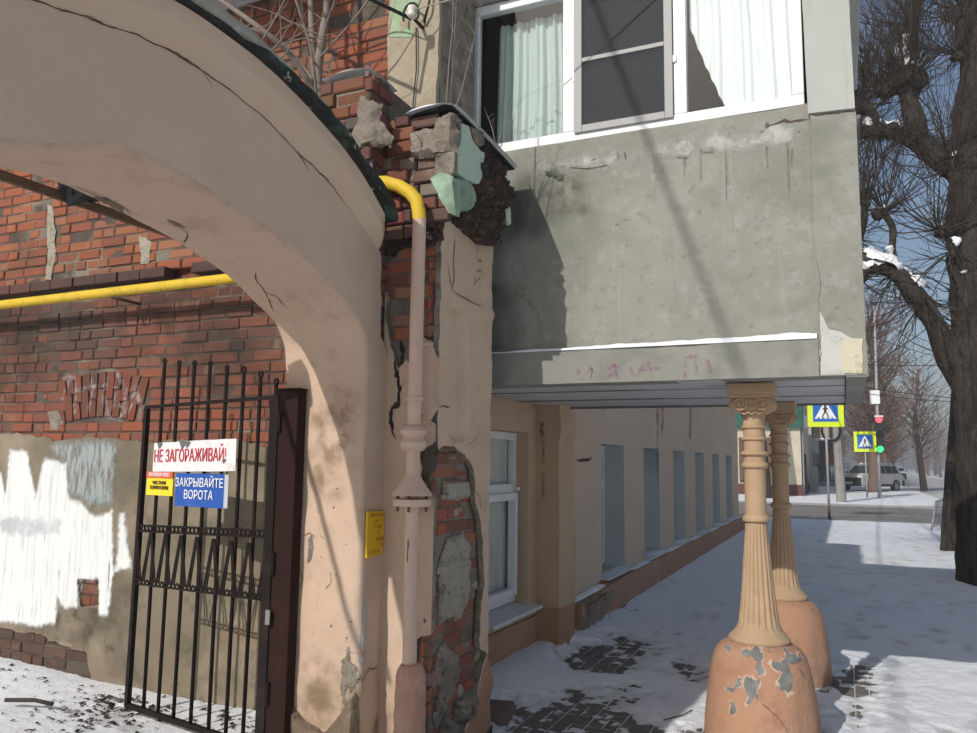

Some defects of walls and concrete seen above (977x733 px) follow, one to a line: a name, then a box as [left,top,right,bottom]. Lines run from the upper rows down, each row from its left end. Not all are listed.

crack [32,0,351,211]
peeling [430,114,485,217]
efflorescence [542,153,617,171]
water stain [647,122,798,163]
crack [448,231,491,306]
spalling [820,313,863,375]
crack [389,341,405,440]
spalling [582,589,617,630]
spalling [290,637,360,733]
peeling [724,645,804,716]